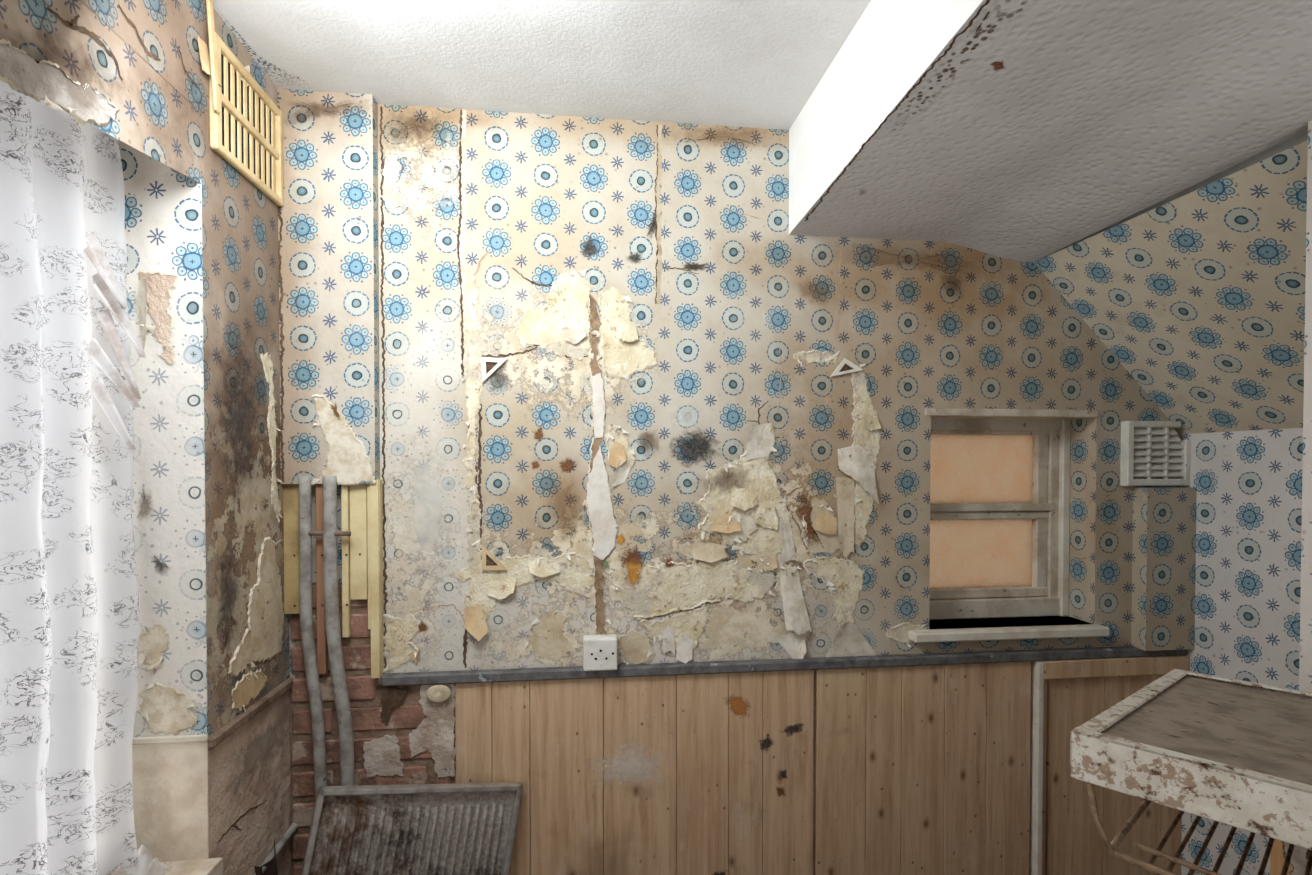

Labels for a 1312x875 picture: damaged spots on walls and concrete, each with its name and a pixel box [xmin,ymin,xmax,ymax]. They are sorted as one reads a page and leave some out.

water stain [32,40,91,82]
water stain [582,237,597,255]
mould [227,361,256,477]
water stain [672,432,715,462]
peeling [726,510,817,576]
water stain [219,562,237,645]
flaking render [228,537,456,875]
crack [217,800,267,843]